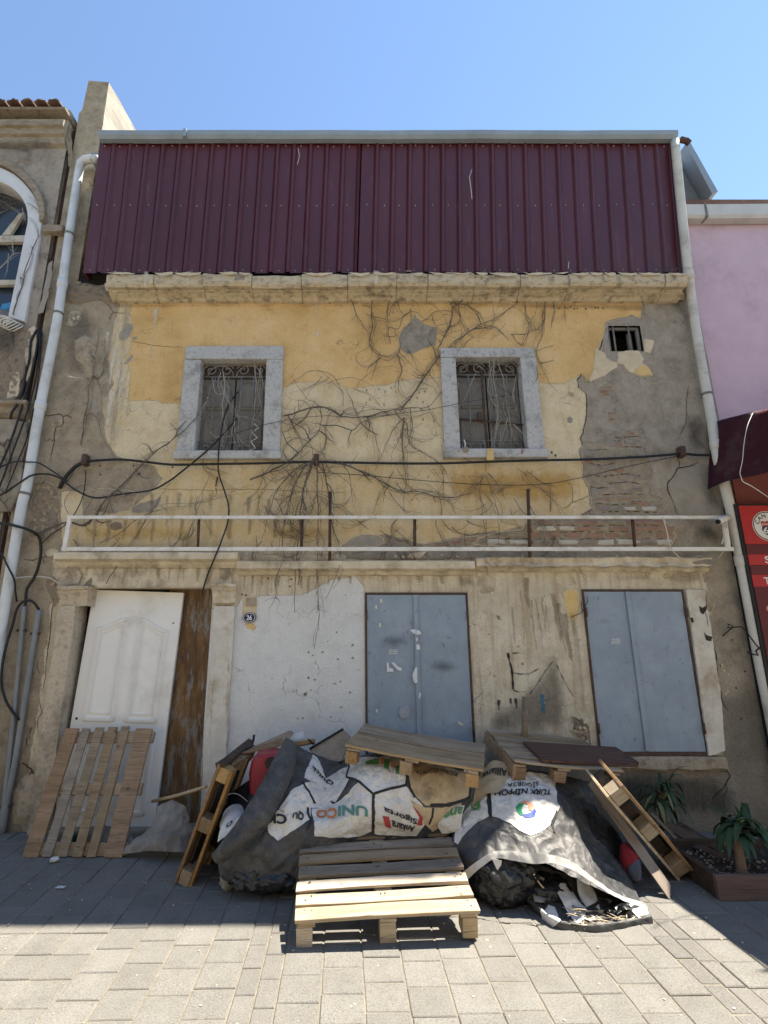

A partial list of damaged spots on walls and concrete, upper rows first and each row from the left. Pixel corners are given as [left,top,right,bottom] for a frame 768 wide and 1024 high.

peeling [119,323,138,365]
peeling [398,313,438,355]
peeling [558,306,654,395]
peeling [82,465,162,532]
flaking render [344,411,723,560]